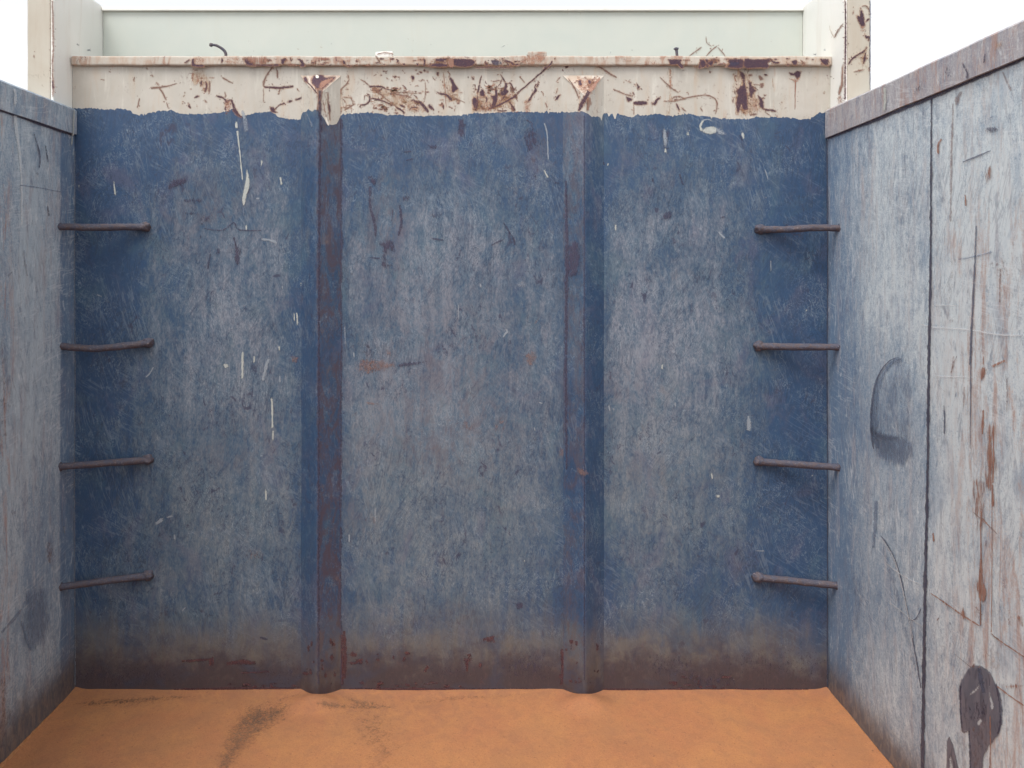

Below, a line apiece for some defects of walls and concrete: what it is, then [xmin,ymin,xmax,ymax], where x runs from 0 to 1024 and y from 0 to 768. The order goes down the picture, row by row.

spalling [304,75,336,93]
spalling [468,74,518,112]
spalling [566,76,600,111]
rust [668,57,830,102]
rust [838,1,849,103]
rust [218,52,555,690]
rust [555,116,599,685]
rust [975,410,995,625]